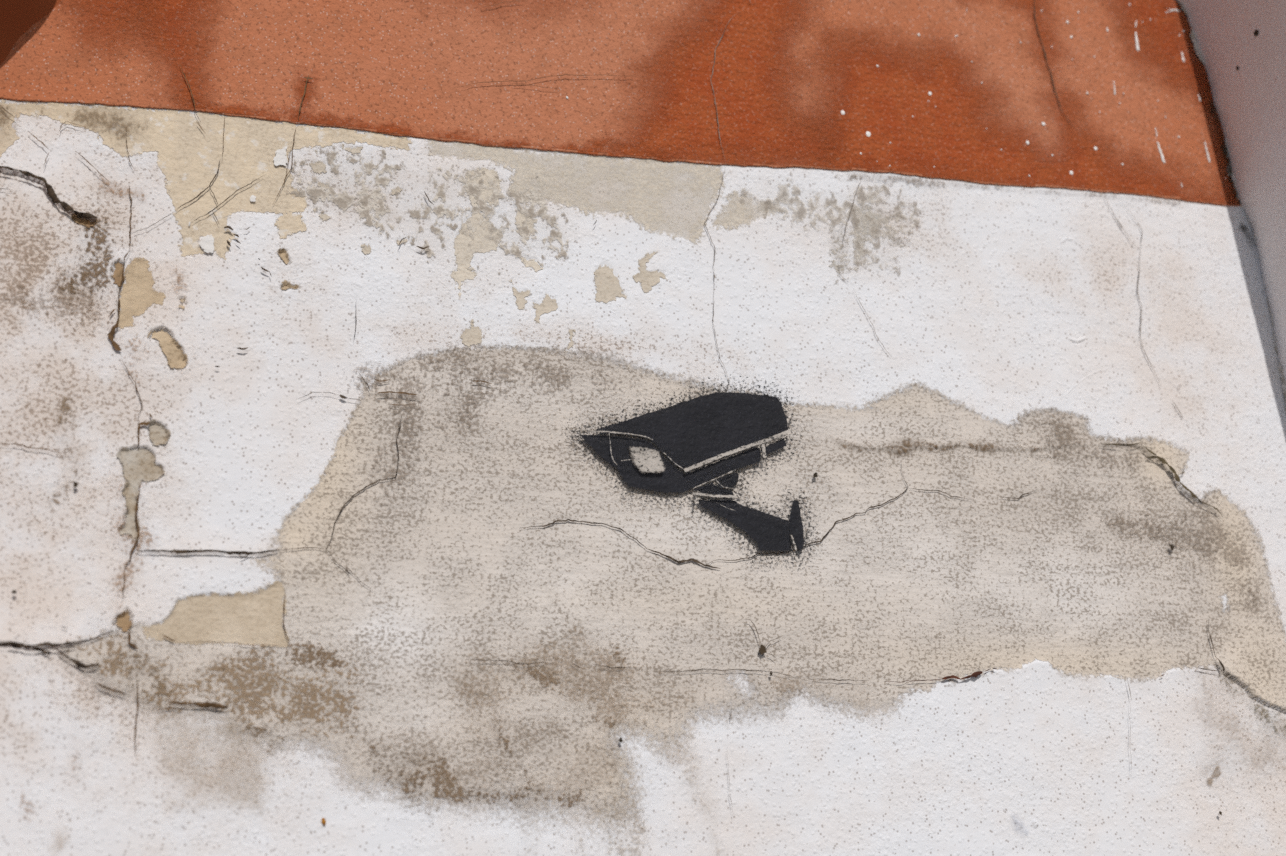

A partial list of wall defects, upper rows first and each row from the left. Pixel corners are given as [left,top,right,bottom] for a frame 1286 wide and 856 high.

peeling [0,99,921,303]
peeling [111,257,186,329]
peeling [498,272,558,323]
crack [0,443,75,453]
crack [122,373,420,592]
peeling [57,319,1286,827]
crack [525,461,971,569]
crack [0,596,289,754]